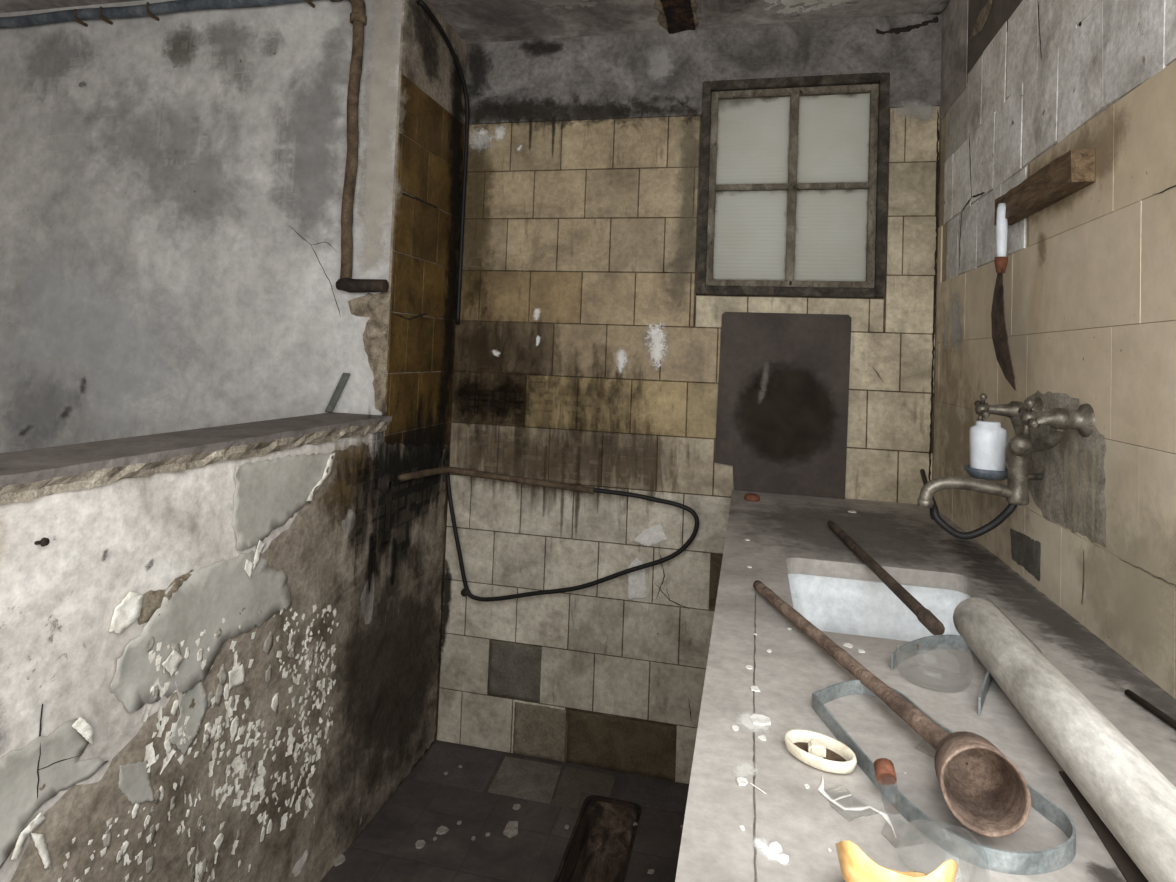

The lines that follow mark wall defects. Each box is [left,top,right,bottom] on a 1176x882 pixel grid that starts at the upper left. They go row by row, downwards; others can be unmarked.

peeling [756,0,865,17]
crack [289,226,341,318]
spalling [348,291,391,412]
peeling [1024,390,1080,411]
peeling [1029,425,1106,548]
crack [1120,559,1176,587]
peeling [0,442,448,882]
water stain [339,535,441,791]
peeling [489,640,677,781]